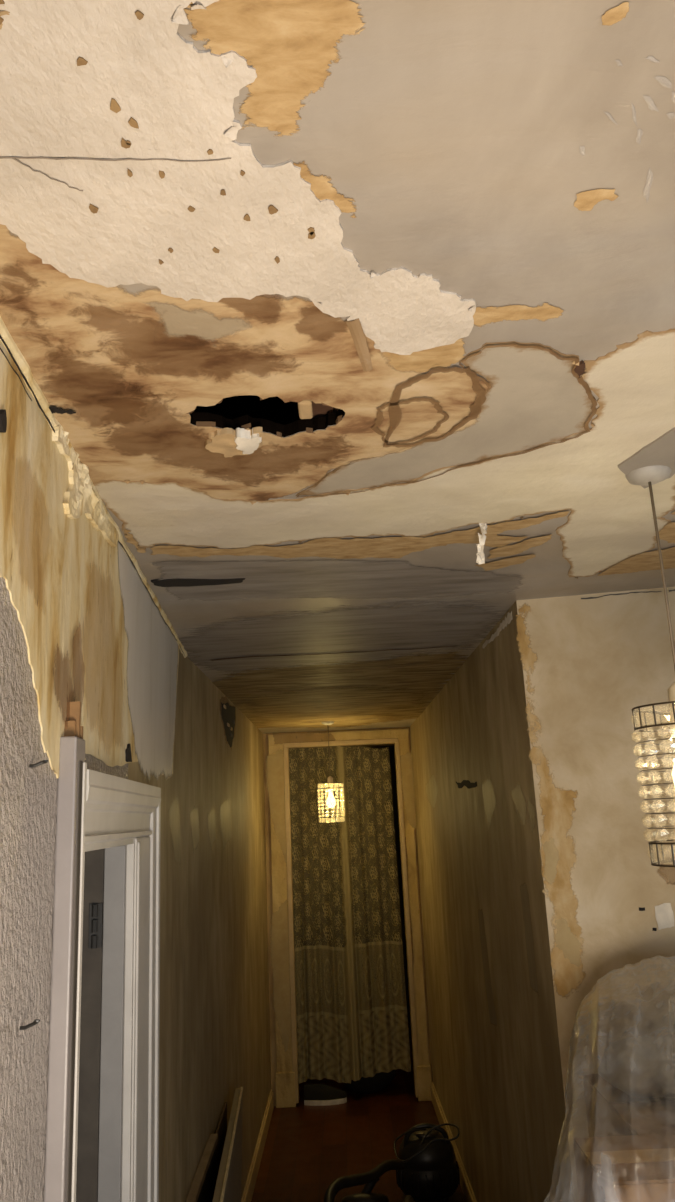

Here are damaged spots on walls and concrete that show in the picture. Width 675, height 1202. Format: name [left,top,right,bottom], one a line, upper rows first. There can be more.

peeling [0,0,564,373]
leakage [0,224,597,501]
flaking render [574,189,618,211]
peeling [0,329,675,778]
peeling [482,779,496,824]
flaking render [512,604,586,997]